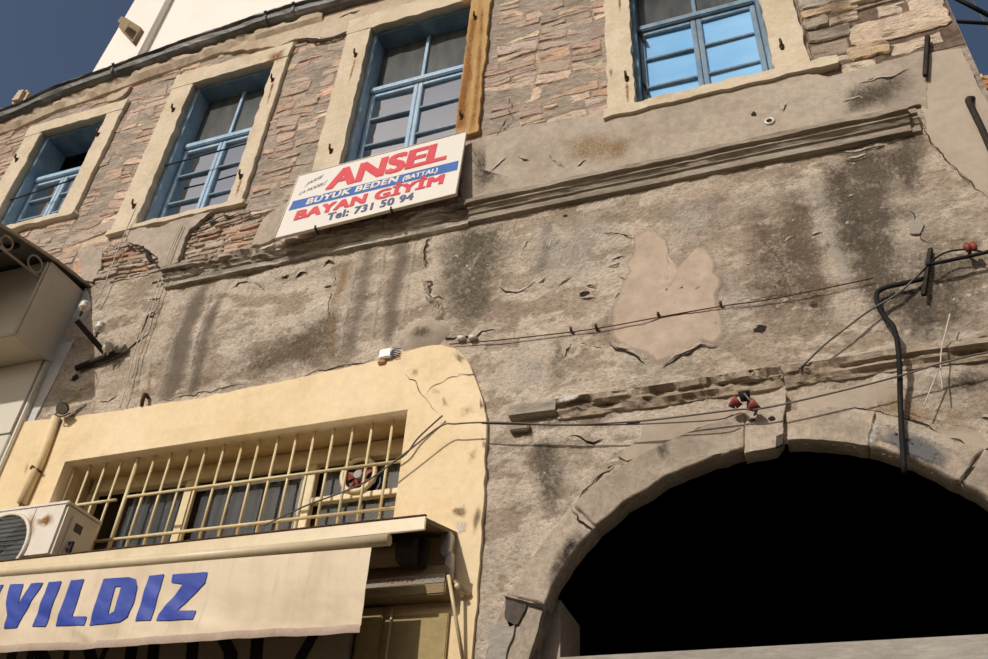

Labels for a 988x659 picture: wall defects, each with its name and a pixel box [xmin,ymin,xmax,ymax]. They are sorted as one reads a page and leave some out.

rust [456,15,483,127]
spalling [78,200,289,284]
water stain [163,288,218,399]
water stain [373,243,415,335]
water stain [444,230,495,315]
peeling [560,229,723,367]
crack [405,374,476,409]
crack [572,475,605,530]